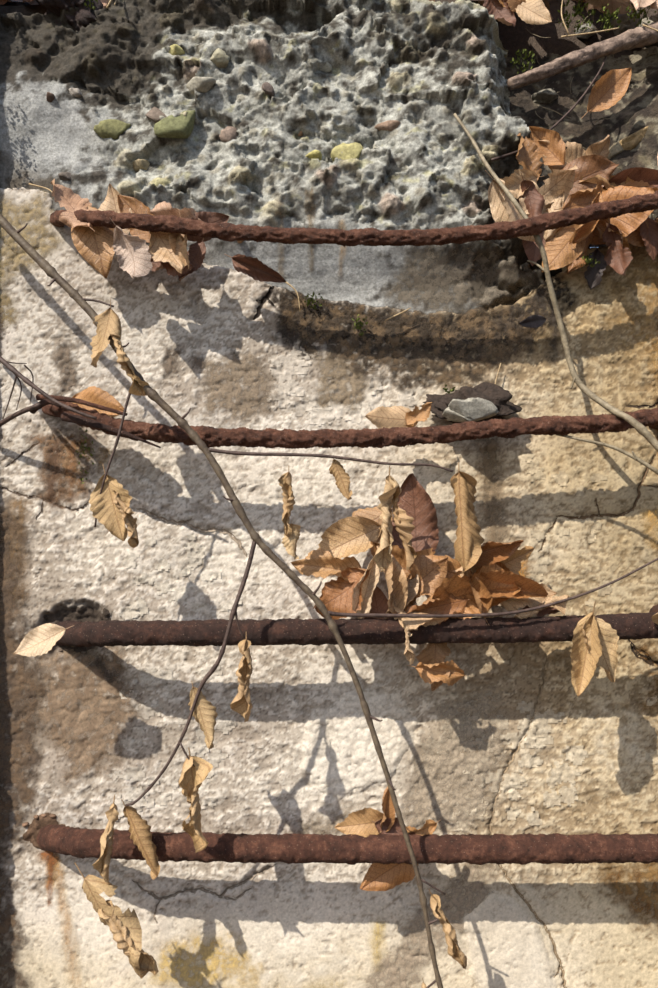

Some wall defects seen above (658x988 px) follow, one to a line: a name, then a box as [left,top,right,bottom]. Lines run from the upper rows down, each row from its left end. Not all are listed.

spalling [0,0,531,230]
spalling [187,237,562,315]
peeling [267,342,417,426]
rust [29,394,161,506]
crack [539,455,658,551]
spalling [43,597,148,624]
crack [628,639,658,666]
peeling [109,765,178,821]
peeling [421,701,589,831]
crack [488,651,548,835]
crack [498,864,567,988]
rust [603,862,658,922]